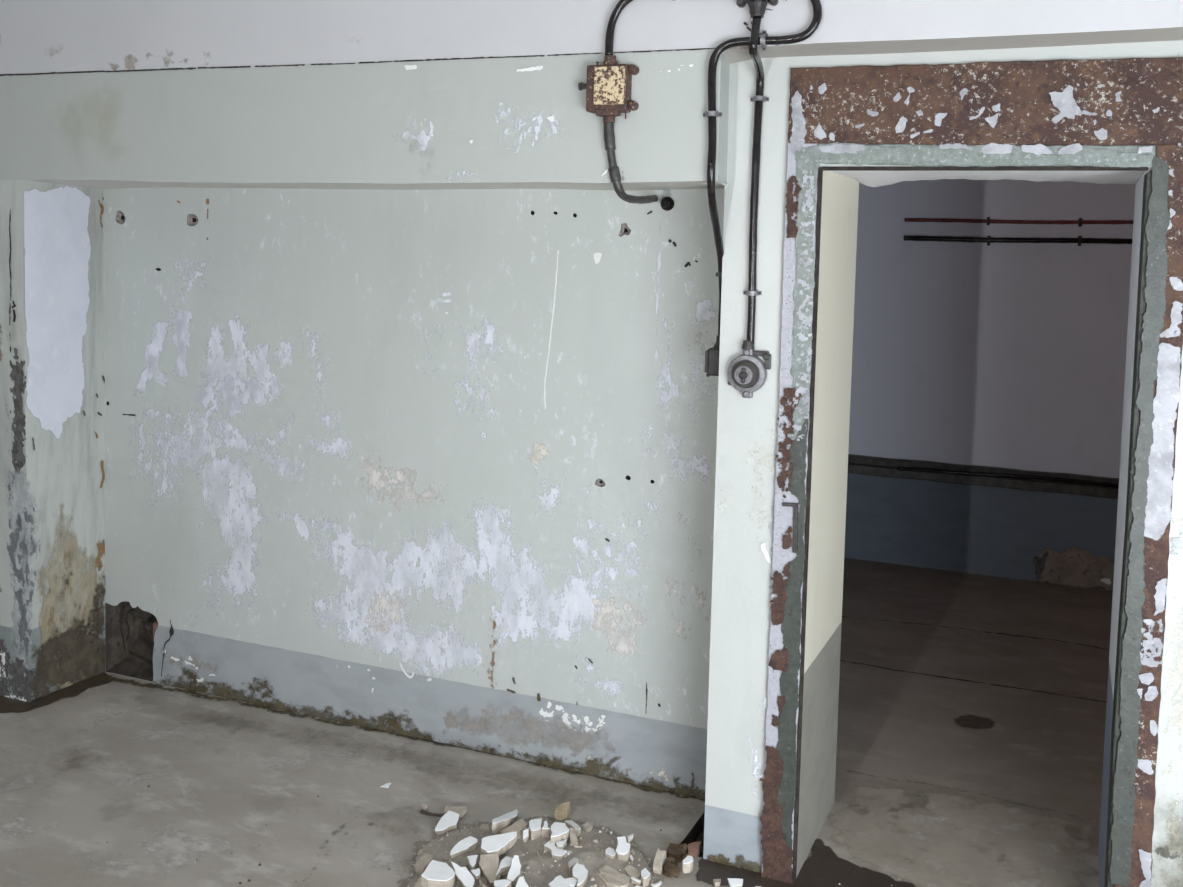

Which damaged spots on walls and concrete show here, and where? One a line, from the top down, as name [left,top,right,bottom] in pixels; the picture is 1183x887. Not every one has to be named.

rust [785,176,802,238]
peeling [129,256,352,600]
rust [774,387,806,498]
leakage [0,348,706,802]
peeling [306,497,650,681]
rust [770,526,792,625]
peeling [1037,546,1114,591]
flaking render [105,601,158,682]
rust [768,649,789,672]
rust [772,696,785,727]
rust [759,746,794,884]
leakage [1155,827,1183,887]